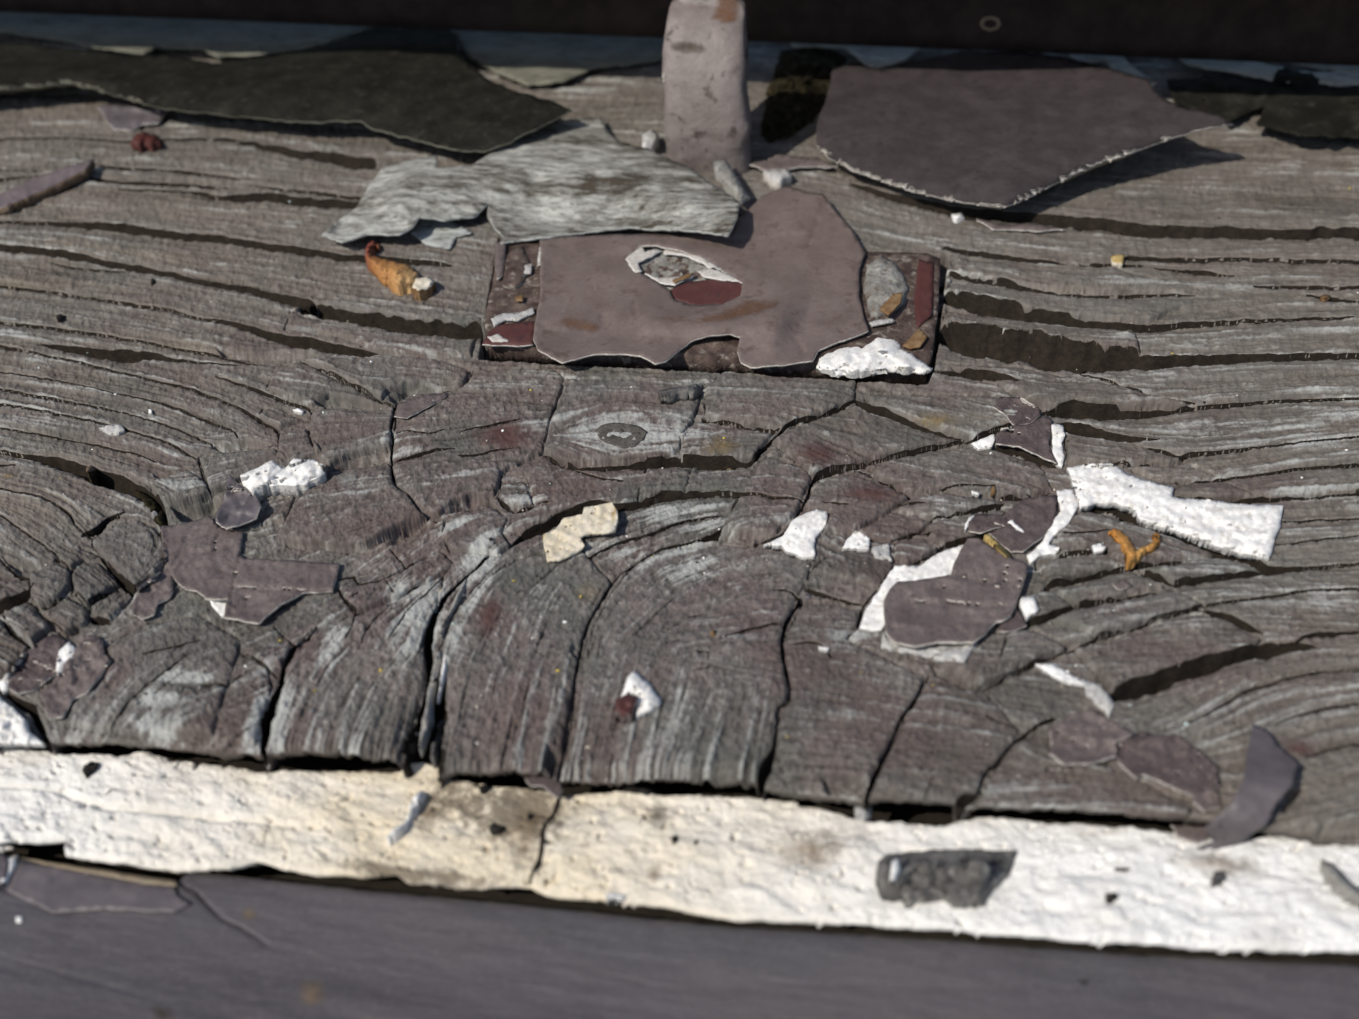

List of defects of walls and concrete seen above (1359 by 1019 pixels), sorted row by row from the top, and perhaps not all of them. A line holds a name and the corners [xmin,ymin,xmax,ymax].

crack [0,137,376,209]
peeling [322,117,869,369]
crack [0,220,522,649]
peeling [994,396,1058,465]
peeling [132,475,340,625]
crack [111,183,1359,885]
peeling [883,495,1058,649]
crack [0,690,56,752]
peeling [9,633,112,720]
peeling [0,853,191,914]